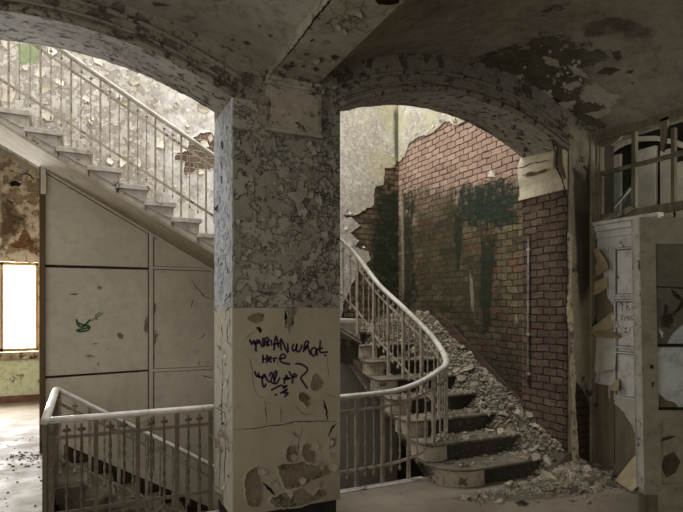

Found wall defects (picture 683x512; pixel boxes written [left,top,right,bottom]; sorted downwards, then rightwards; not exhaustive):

crack [278,0,331,66]
peeling [1,80,16,102]
peeling [22,65,64,121]
peeling [0,147,39,189]
peeling [107,150,141,167]
flaking render [173,123,228,183]
peeling [7,250,39,263]
peeling [261,173,342,336]
flaking render [566,232,590,463]
crack [199,332,337,490]
flaking render [243,431,339,510]